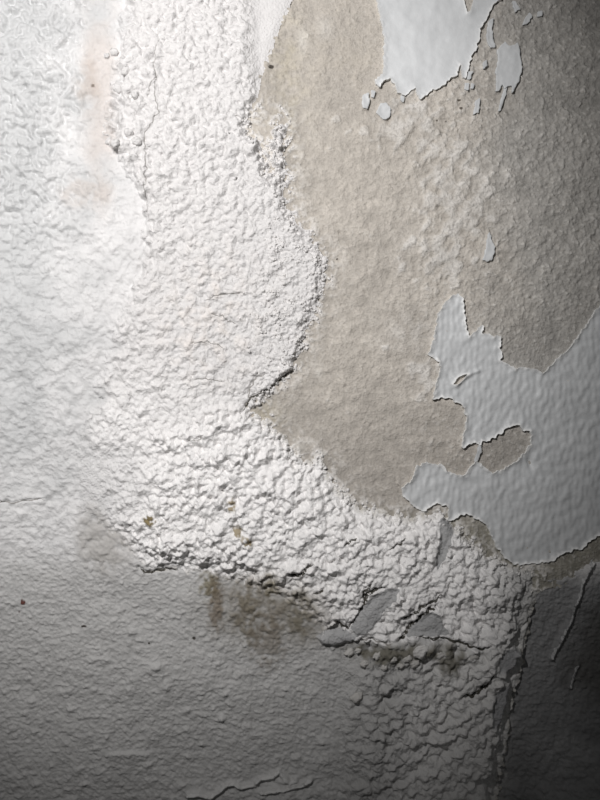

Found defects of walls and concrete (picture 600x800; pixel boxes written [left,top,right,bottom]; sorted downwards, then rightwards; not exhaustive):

crack [243,372,290,411]
flaking render [74,0,600,671]